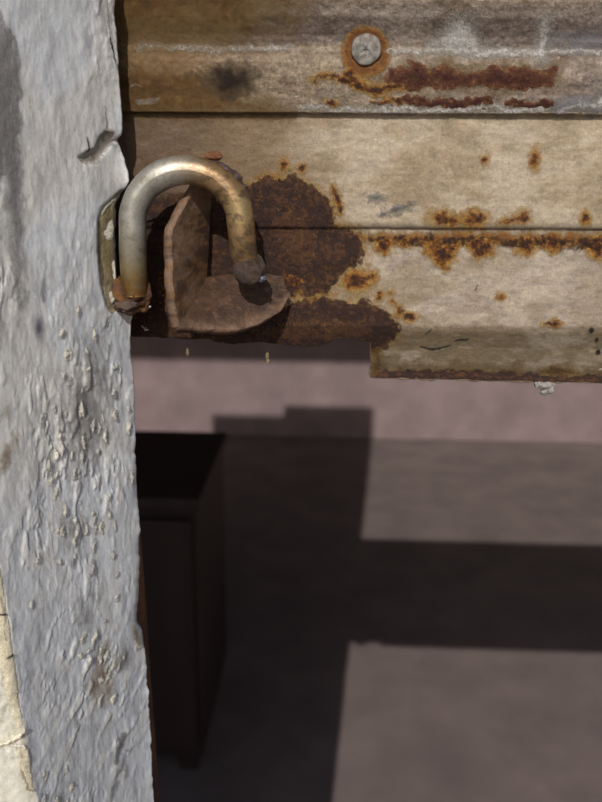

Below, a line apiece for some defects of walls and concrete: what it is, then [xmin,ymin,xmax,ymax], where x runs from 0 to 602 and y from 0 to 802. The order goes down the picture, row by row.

leakage [0,11,24,306]
corrosion [310,26,559,110]
corrosion [112,159,602,383]